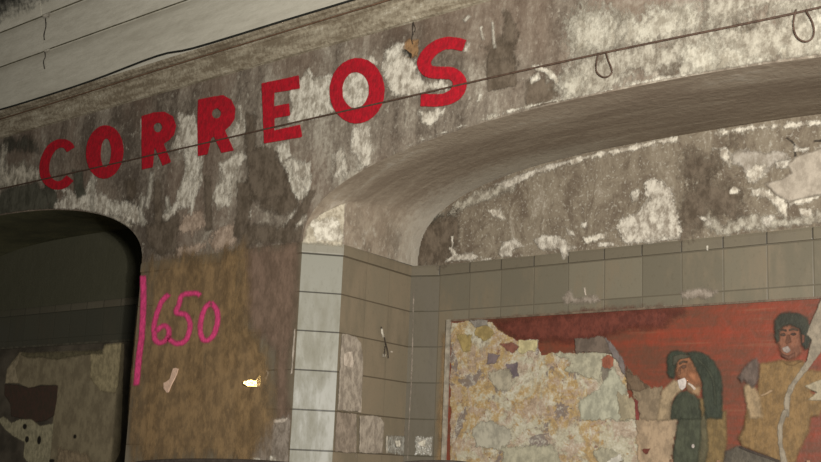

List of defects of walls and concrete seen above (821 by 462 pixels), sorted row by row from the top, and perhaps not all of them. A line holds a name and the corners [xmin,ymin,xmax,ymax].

water stain [287,68,334,124]
water stain [342,72,369,108]
water stain [367,43,448,97]
water stain [417,108,445,125]
water stain [330,125,374,178]
spalling [433,136,678,221]
water stain [684,147,789,188]
spalling [714,120,821,218]
water stain [699,208,821,236]